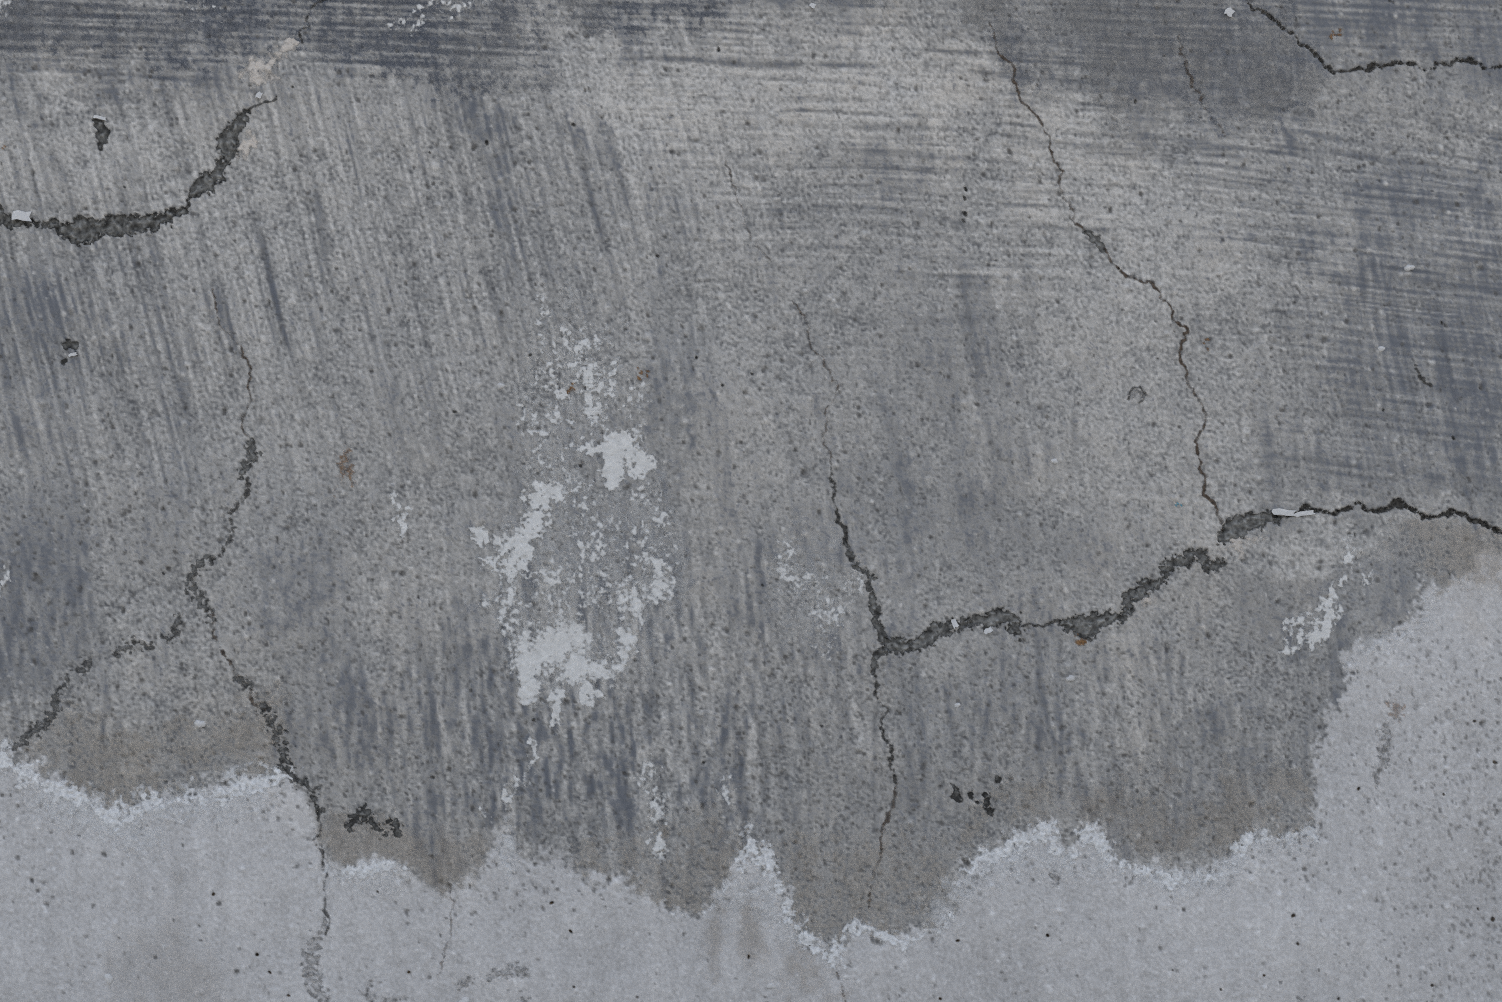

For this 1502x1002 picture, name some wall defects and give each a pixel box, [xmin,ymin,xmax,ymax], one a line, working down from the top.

crack [1224,0,1502,75]
crack [797,26,1502,854]
crack [7,289,329,934]
water stain [0,739,294,835]
water stain [323,860,409,891]
water stain [722,824,957,970]
water stain [959,819,1319,891]